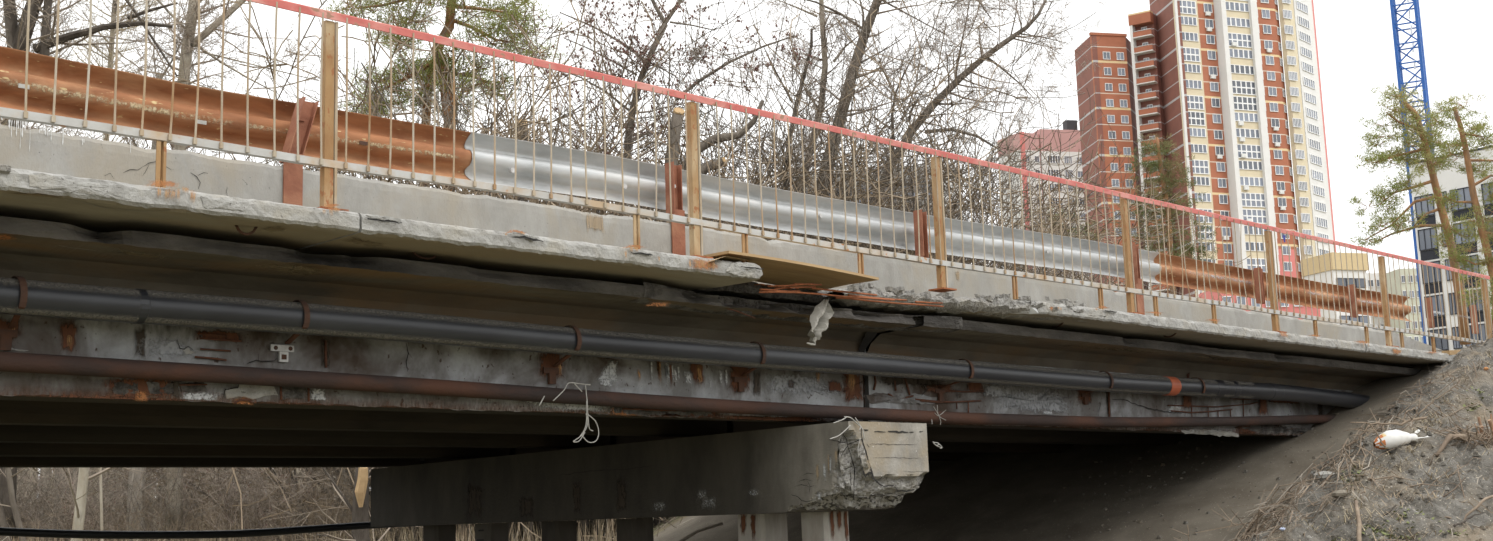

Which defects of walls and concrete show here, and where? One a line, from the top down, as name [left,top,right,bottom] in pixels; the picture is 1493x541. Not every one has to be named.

spalling [342,210,402,223]
spalling [509,233,543,242]
spalling [726,262,764,278]
spalling [631,282,1117,333]
rust [638,361,760,393]
spalling [858,445,871,474]